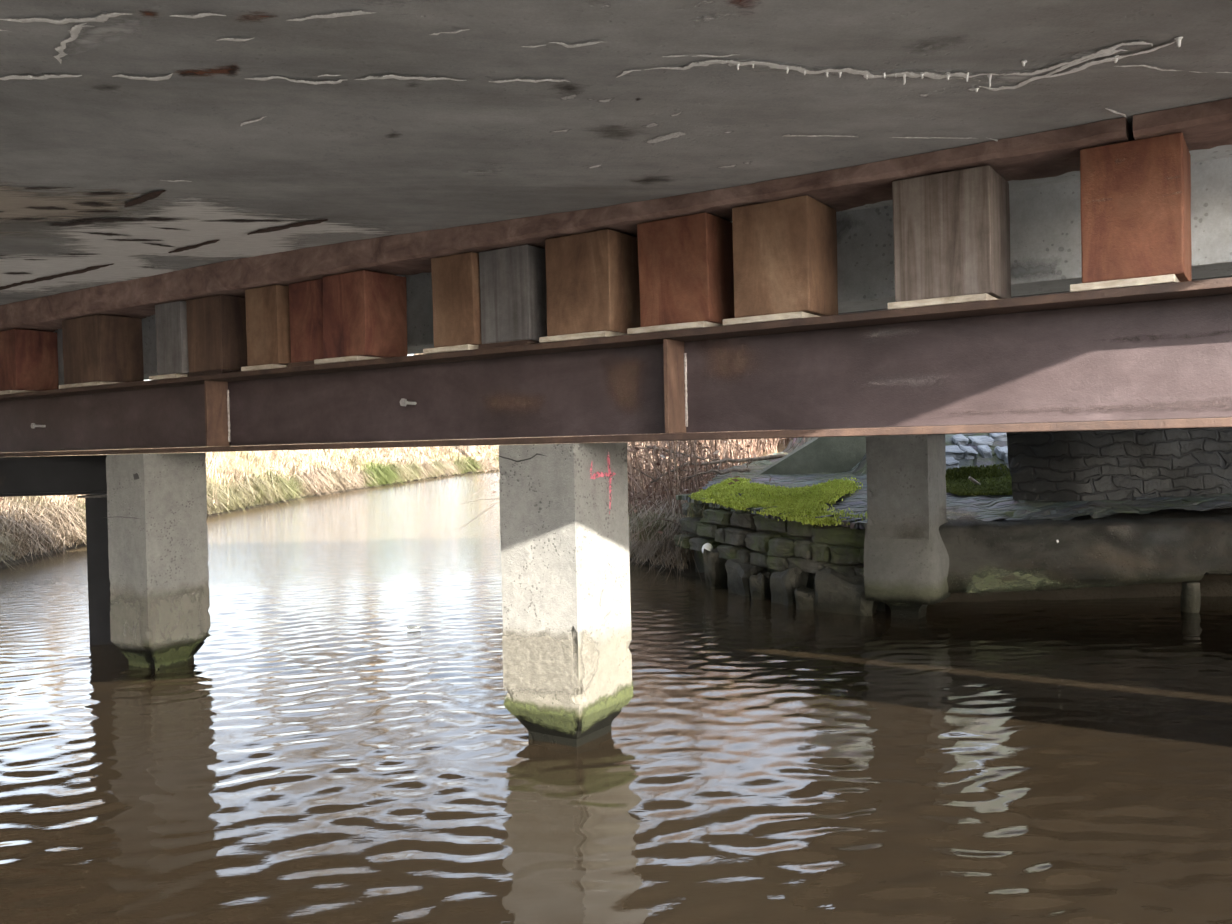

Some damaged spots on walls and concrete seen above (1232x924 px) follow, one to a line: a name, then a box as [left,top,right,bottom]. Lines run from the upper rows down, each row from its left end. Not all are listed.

crack [288,10,376,21]
crack [170,13,253,41]
crack [429,28,469,36]
crack [0,12,140,80]
crack [521,40,604,48]
crack [616,37,1231,97]
crack [112,73,173,81]
crack [245,74,570,85]
crack [240,116,266,126]
water stain [110,590,203,649]